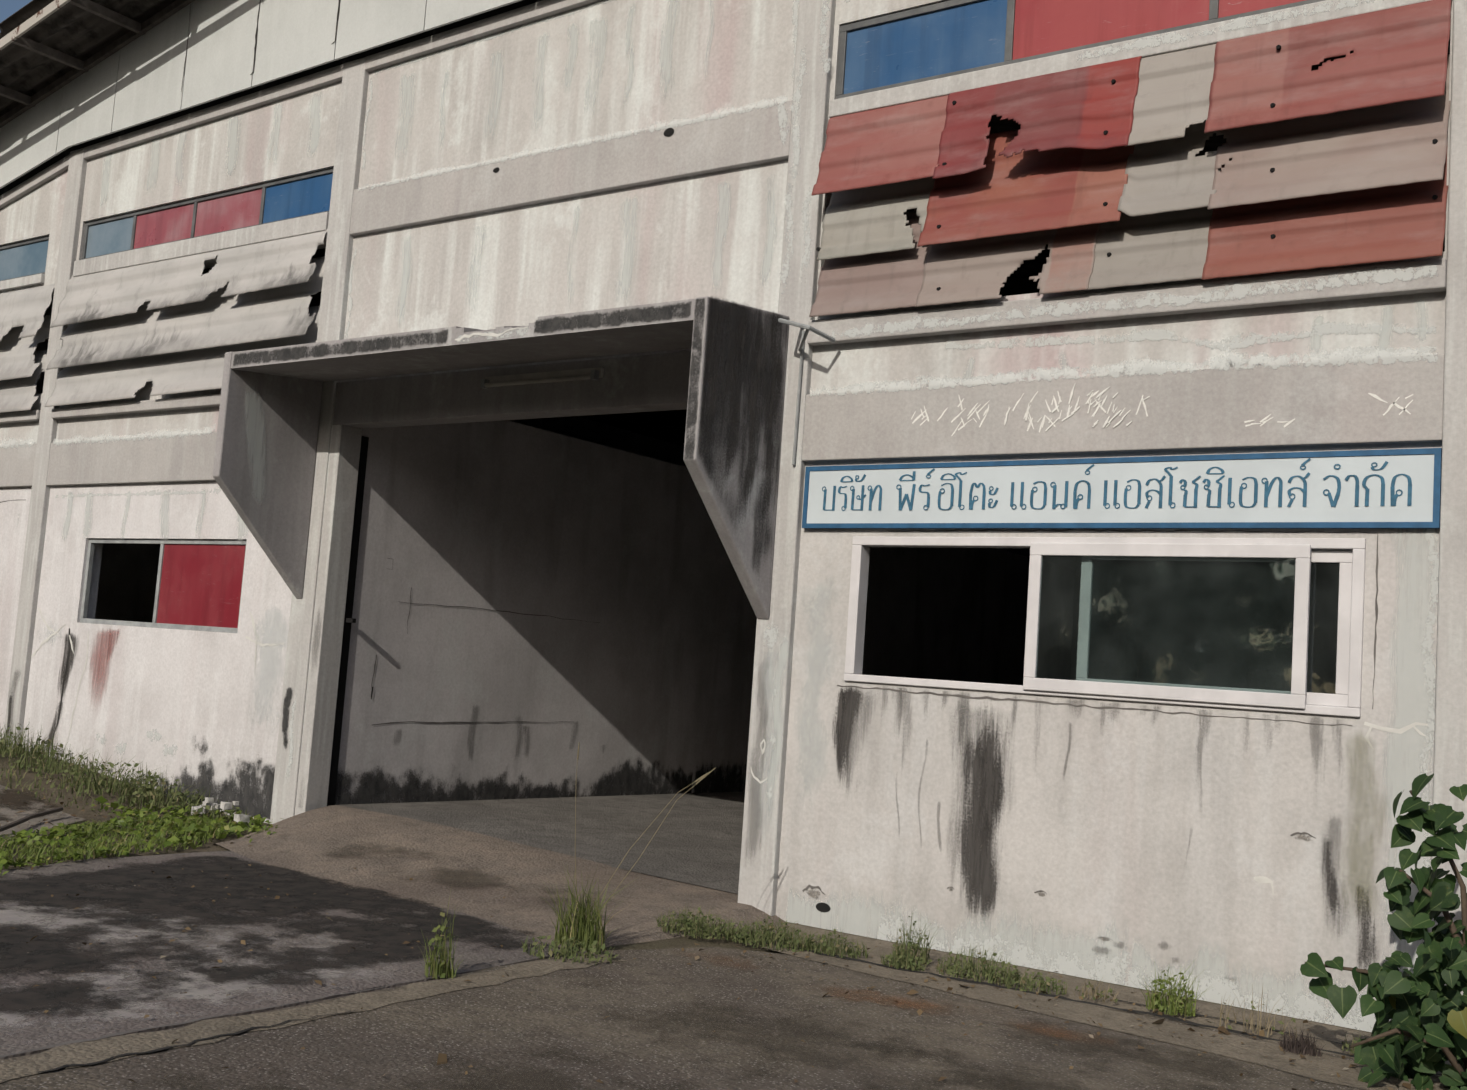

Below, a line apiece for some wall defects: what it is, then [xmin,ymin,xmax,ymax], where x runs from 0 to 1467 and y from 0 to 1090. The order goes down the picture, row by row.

leakage [233,329,448,366]
peeling [809,265,1438,397]
leakage [534,297,788,566]
leakage [834,687,860,778]
leakage [161,745,275,820]
leakage [335,760,747,805]
leakage [961,723,1002,913]
leakage [1324,842,1338,908]
leakage [1356,887,1375,967]